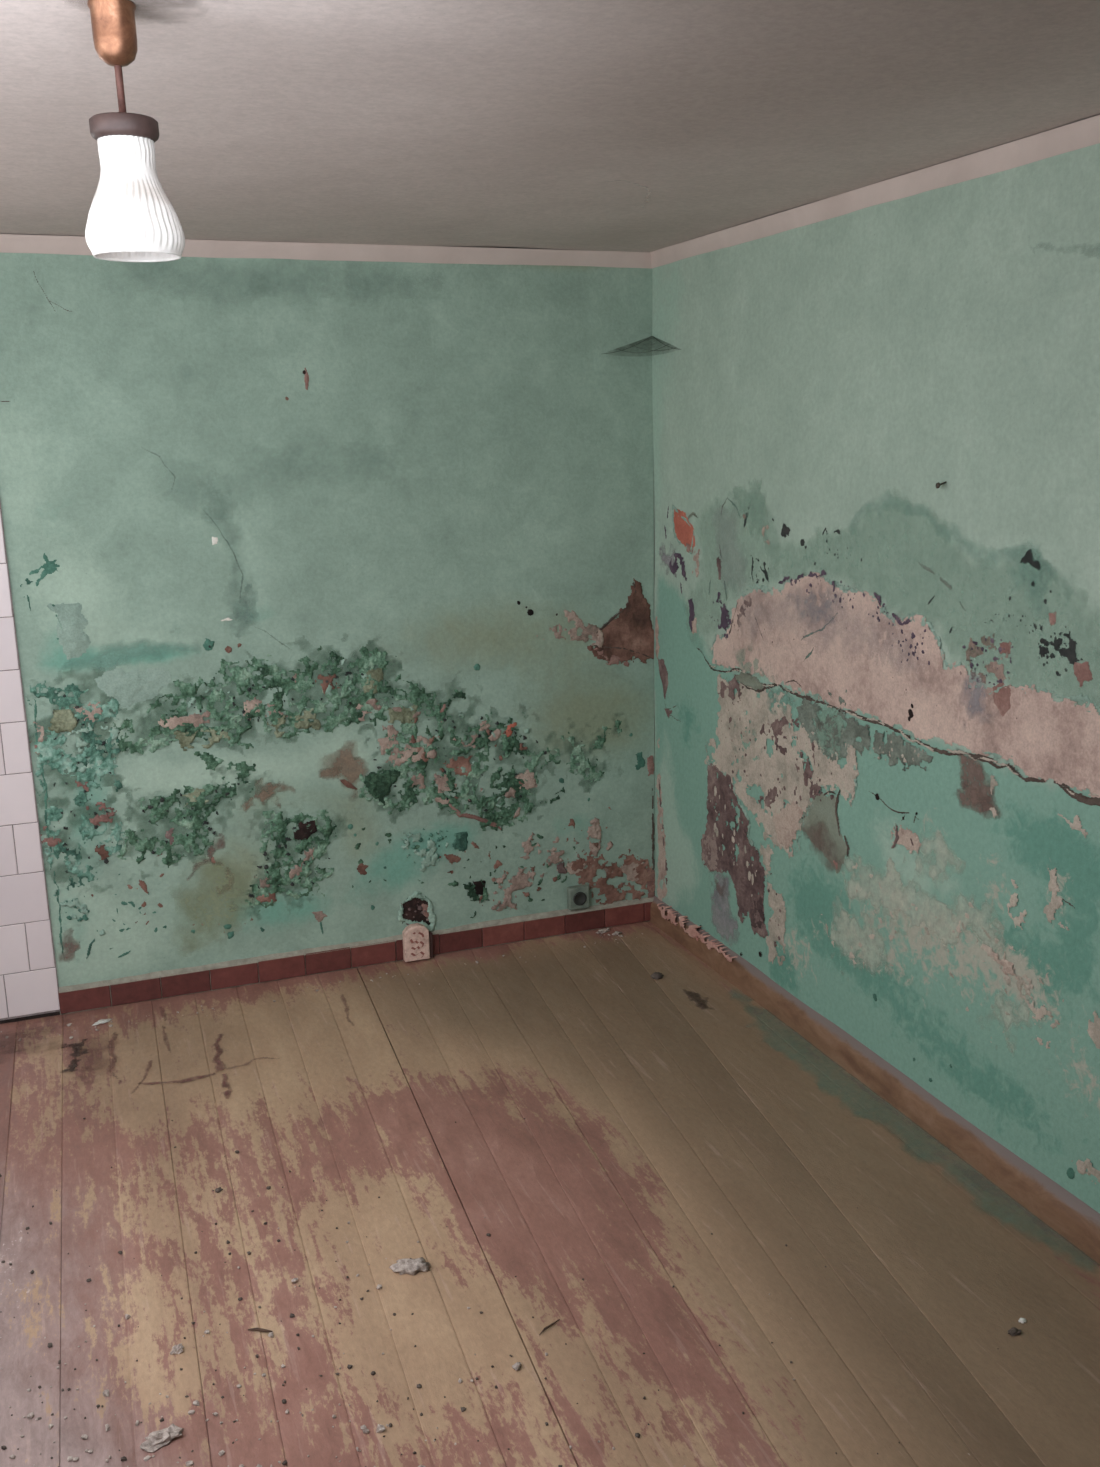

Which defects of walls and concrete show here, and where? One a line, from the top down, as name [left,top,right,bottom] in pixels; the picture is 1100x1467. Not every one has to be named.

flaking render [348,497,1100,1049]
crack [697,648,1100,806]
peeling [59,874,163,959]